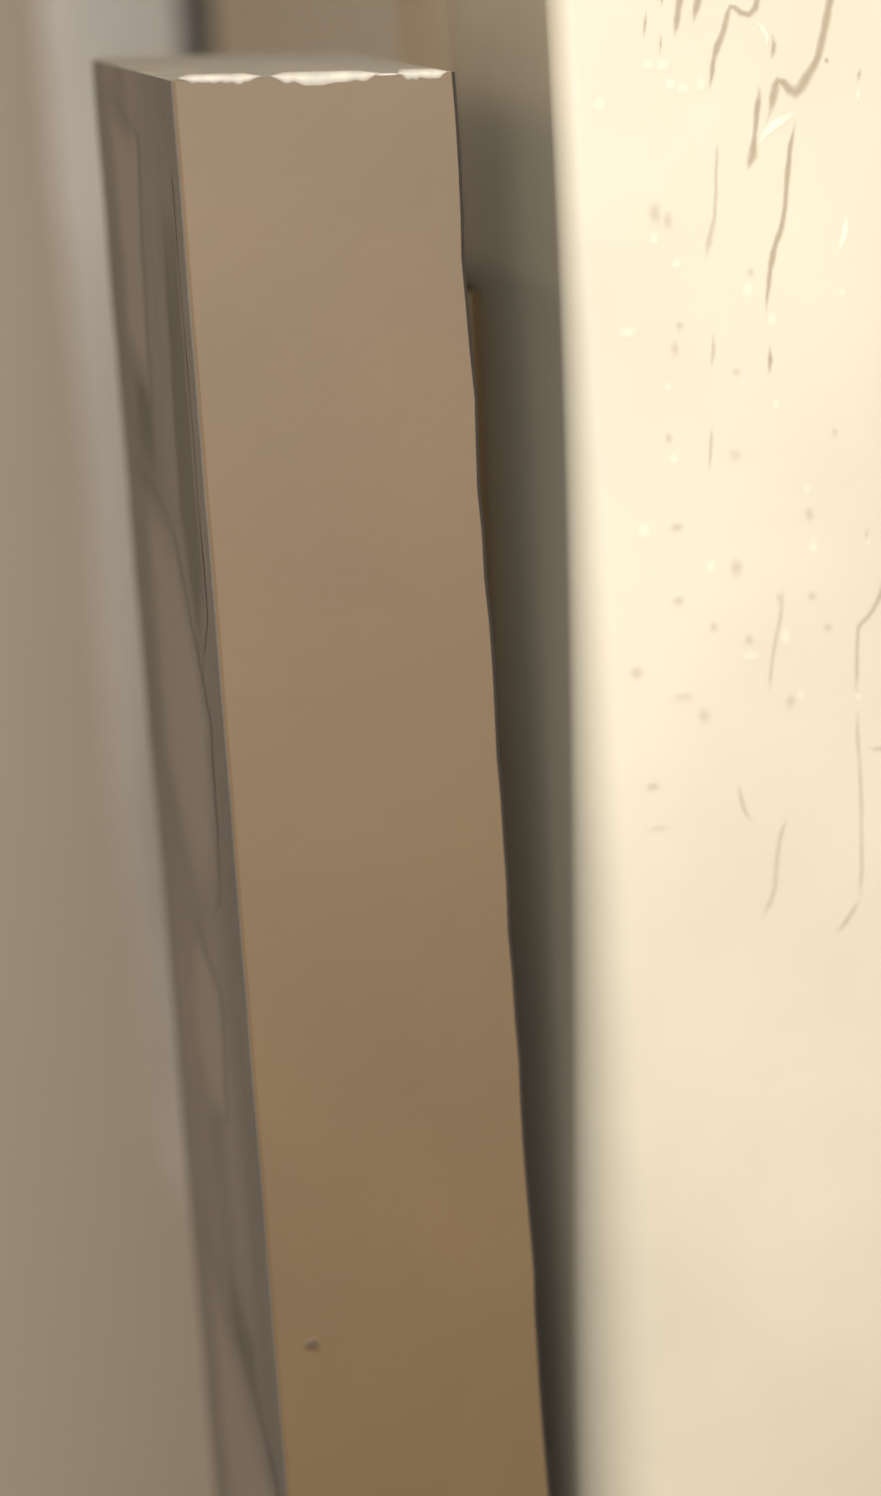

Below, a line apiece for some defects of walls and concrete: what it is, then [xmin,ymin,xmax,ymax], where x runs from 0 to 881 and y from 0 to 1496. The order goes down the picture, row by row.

crack [642,0,836,375]
crack [707,425,715,474]
crack [834,583,881,933]